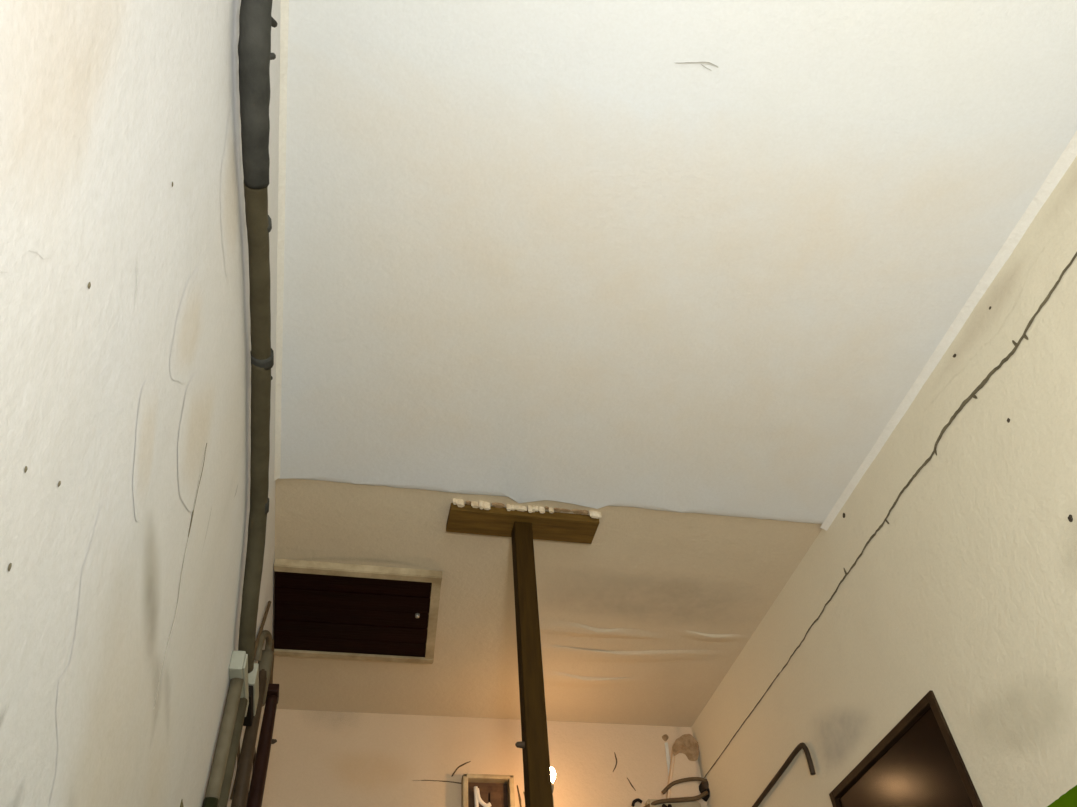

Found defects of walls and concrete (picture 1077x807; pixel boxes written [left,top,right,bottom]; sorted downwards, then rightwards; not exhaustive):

crack [154,443,207,708]
crack [704,252,1077,778]